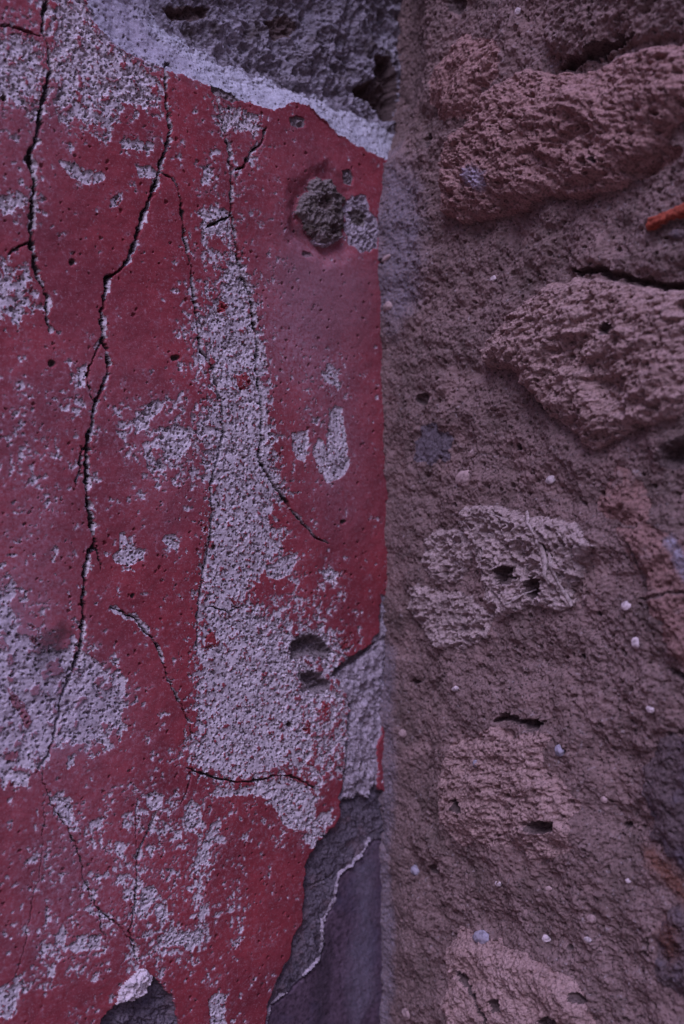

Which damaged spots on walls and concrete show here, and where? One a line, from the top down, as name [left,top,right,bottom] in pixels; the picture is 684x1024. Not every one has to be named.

spalling [0,0,402,160]
crack [0,0,57,334]
peeling [59,160,105,185]
peeling [136,165,157,179]
flaking render [293,169,379,258]
peeling [0,255,45,330]
peeling [104,531,144,571]
crack [25,61,328,962]
peeling [134,204,387,1024]
peeling [0,553,138,787]
peeling [55,925,102,953]
flaking render [100,977,178,1024]